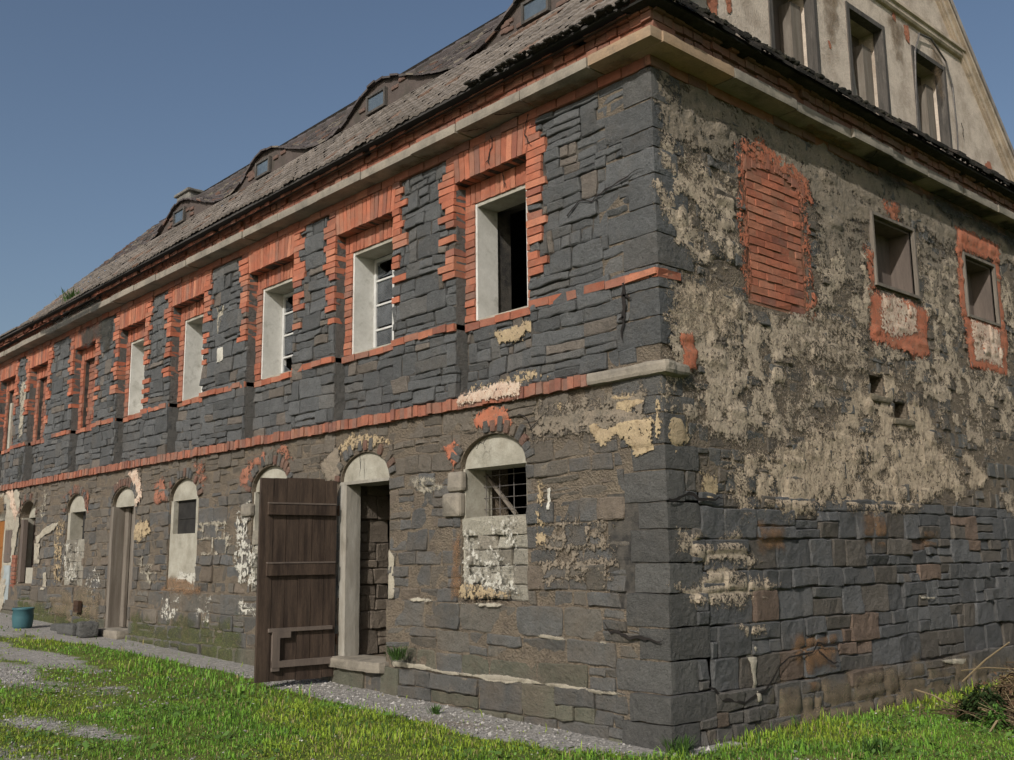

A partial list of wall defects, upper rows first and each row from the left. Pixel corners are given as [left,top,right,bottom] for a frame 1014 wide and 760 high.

flaking render [490,319,531,346]
flaking render [527,67,1014,638]
flaking render [457,369,548,429]
flaking render [239,444,292,487]
flaking render [442,438,458,471]
flaking render [117,468,142,507]
flaking render [154,477,167,506]
flaking render [0,489,20,611]
flaking render [133,519,152,544]
flaking render [199,500,257,586]
peeling [462,518,518,598]
flaking render [160,595,181,620]